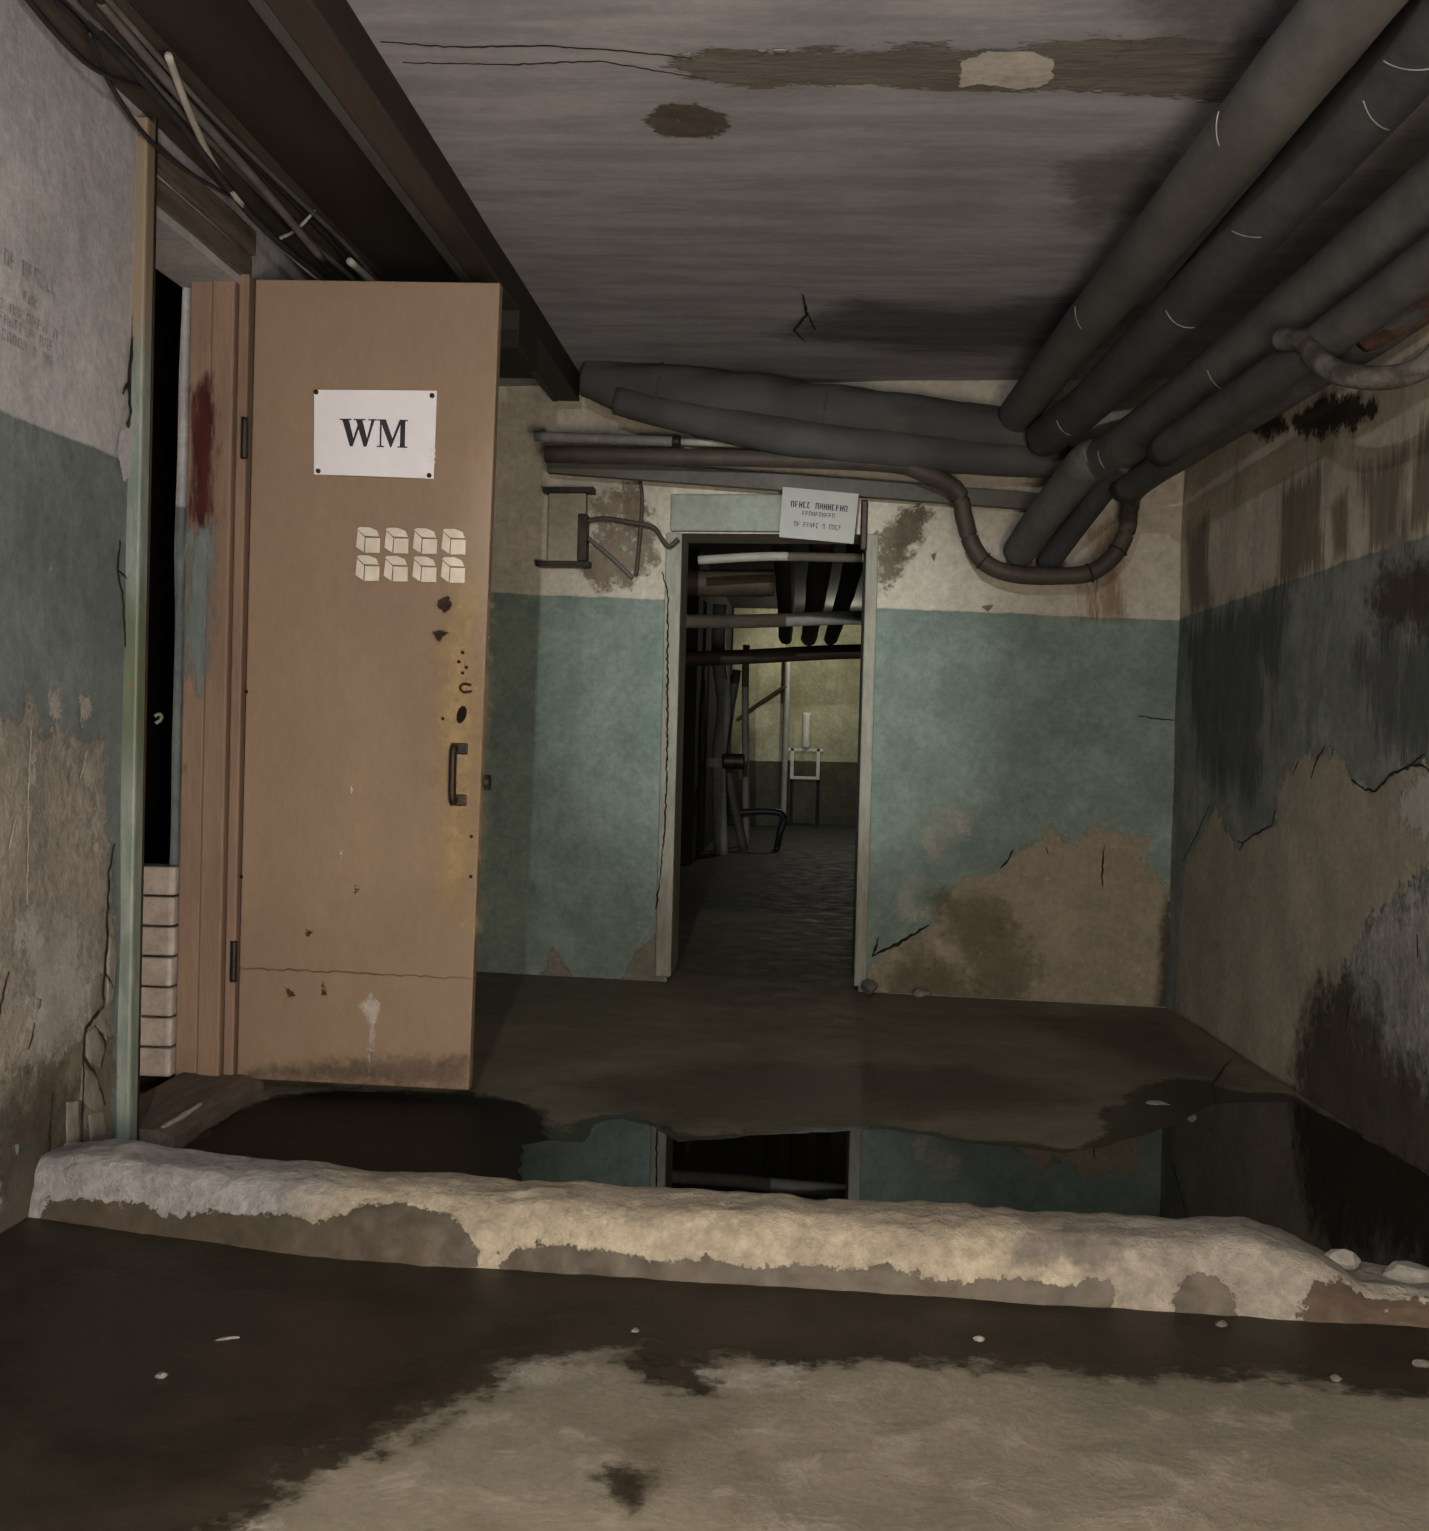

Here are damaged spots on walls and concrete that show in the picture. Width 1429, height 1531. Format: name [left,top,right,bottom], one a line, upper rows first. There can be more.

spalling [661,34,1265,103]
water stain [788,297,1074,352]
water stain [1357,422,1429,568]
water stain [1187,469,1347,802]
crack [1237,812,1275,850]
crack [1294,746,1325,778]
crack [1351,754,1429,792]
peeling [0,679,121,1162]
peeling [861,745,1429,1096]
crack [48,844,115,1152]